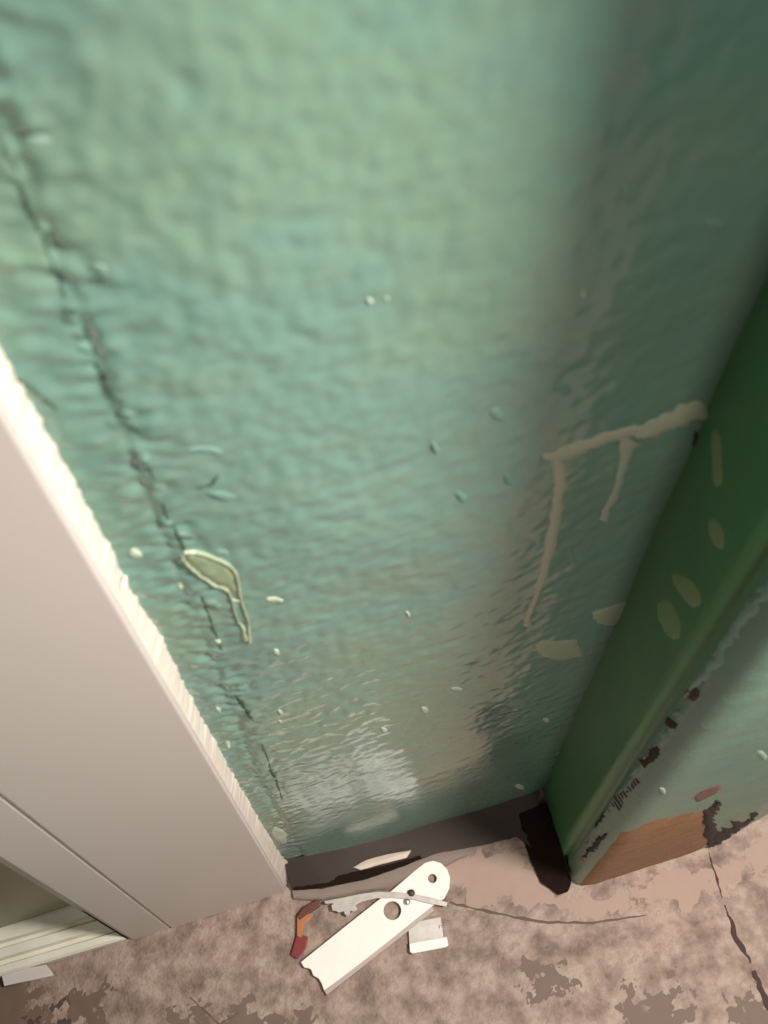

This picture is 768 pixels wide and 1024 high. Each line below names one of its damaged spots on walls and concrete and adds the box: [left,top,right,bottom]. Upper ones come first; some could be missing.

crack [0,138,189,561]
crack [202,596,222,650]
crack [235,696,254,721]
crack [262,745,283,800]
spalling [595,778,641,827]
spalling [639,746,660,768]
spalling [692,784,721,802]
spalling [292,846,479,902]
hole [519,802,571,895]
crack [709,853,768,1011]